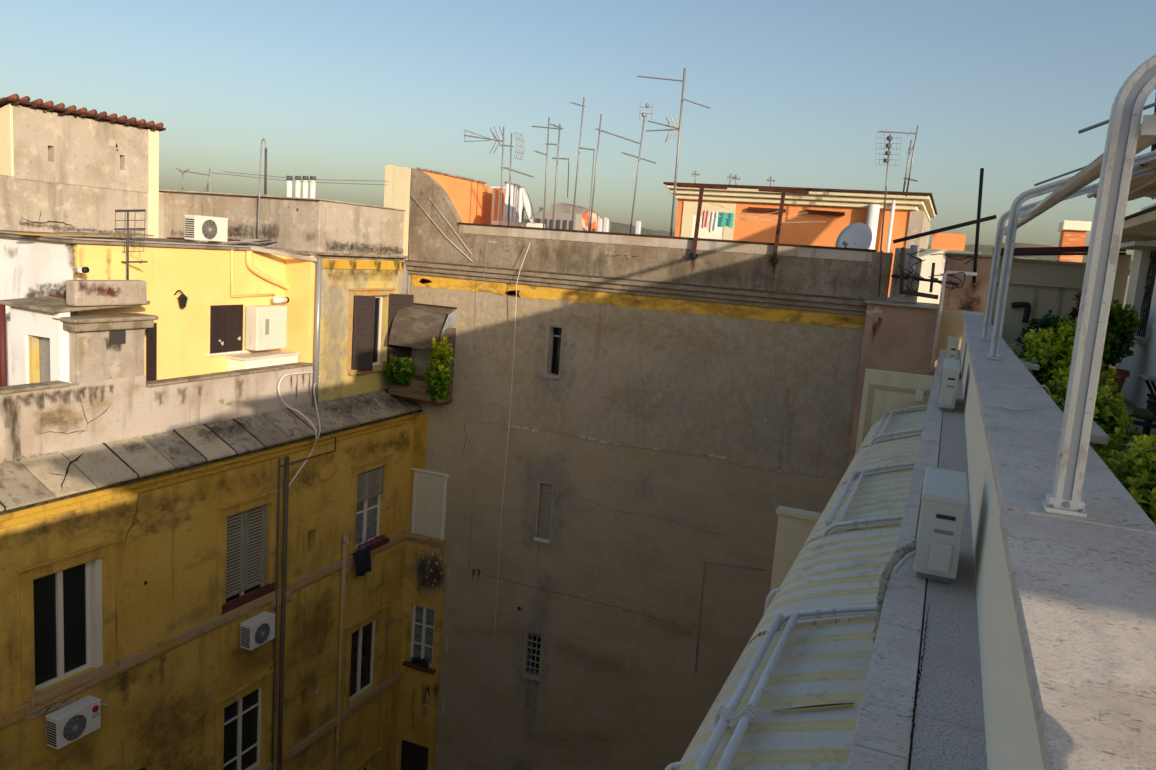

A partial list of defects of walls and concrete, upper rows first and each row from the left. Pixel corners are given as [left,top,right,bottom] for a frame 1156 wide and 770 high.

damp [3,387,112,456]
crack [37,399,111,488]
crack [124,493,141,547]